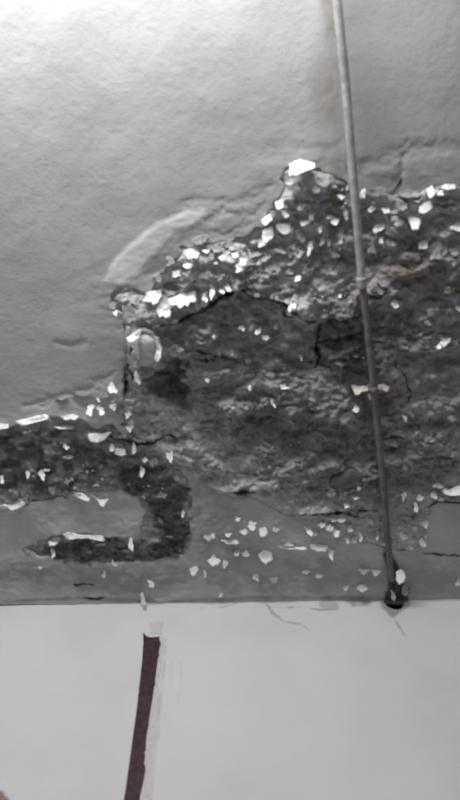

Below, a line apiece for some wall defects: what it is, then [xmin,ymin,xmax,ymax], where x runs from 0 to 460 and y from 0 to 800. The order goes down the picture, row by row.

spalling [0,159,460,616]
crack [160,289,366,367]